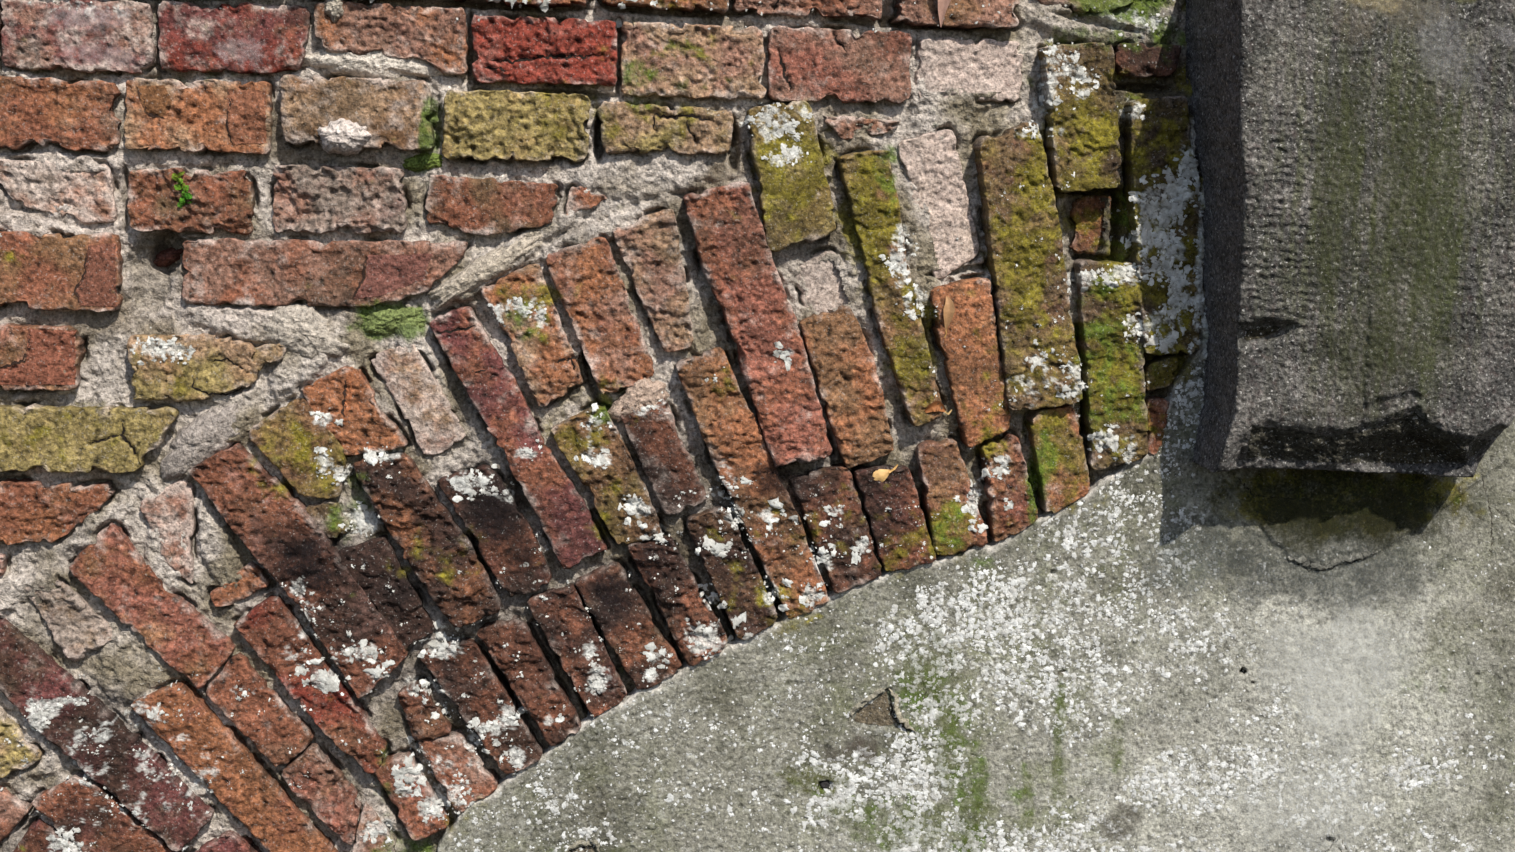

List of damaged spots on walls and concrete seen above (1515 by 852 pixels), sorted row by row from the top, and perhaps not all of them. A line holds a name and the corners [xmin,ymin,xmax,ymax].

leakage [1159,469,1447,598]
spalling [849,688,917,733]